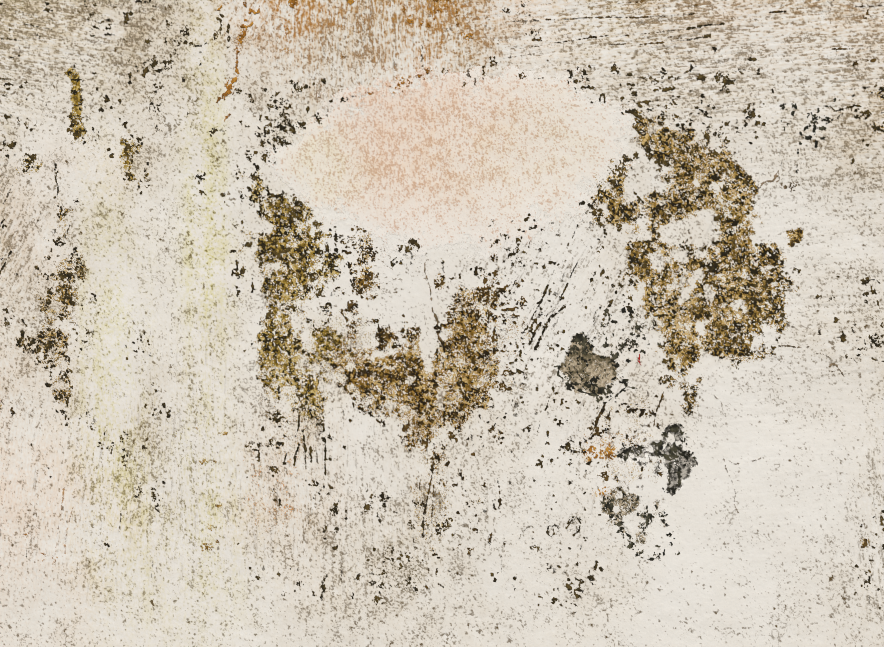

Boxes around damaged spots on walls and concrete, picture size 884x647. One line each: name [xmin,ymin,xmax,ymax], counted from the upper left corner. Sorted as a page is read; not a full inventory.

mould [57,64,99,145]
damp [82,0,231,132]
corrosion [216,2,260,103]
corrosion [391,0,473,40]
damp [797,85,884,154]
damp [2,156,128,468]
damp [230,78,577,611]
spalling [554,332,635,404]
damp [517,57,803,487]
damp [834,275,884,362]
spalling [600,423,698,561]
damp [538,560,604,614]